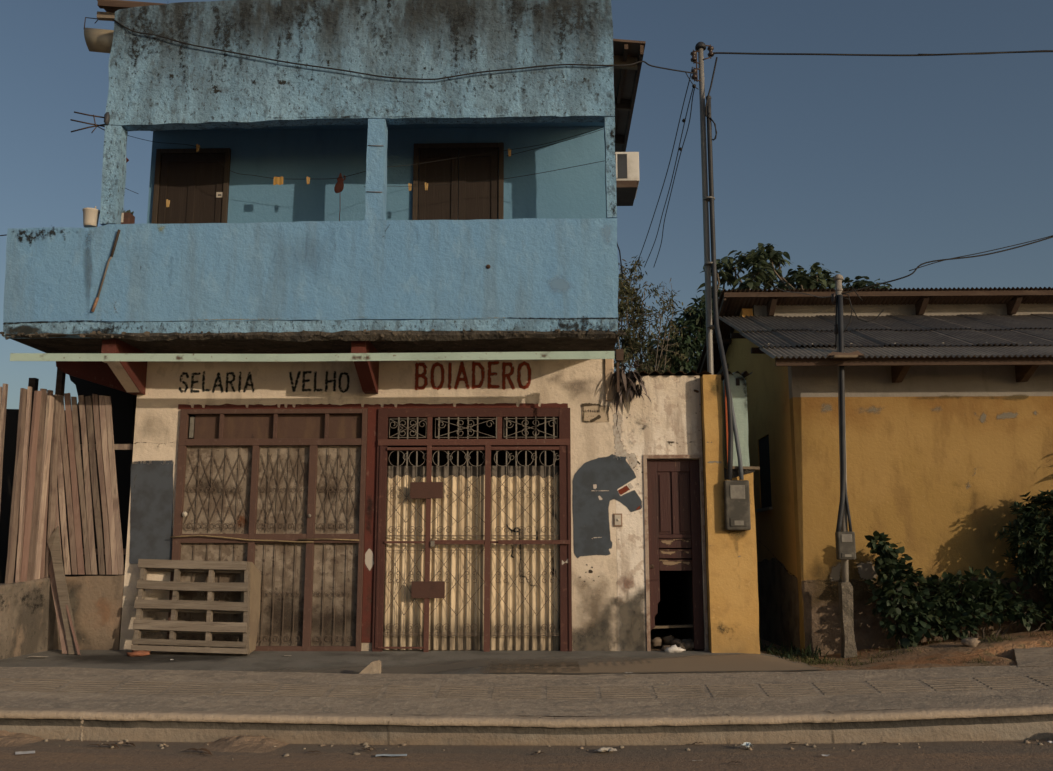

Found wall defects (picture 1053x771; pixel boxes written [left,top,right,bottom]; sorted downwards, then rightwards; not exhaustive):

water stain [121,6,197,90]
water stain [211,4,254,93]
water stain [276,0,333,86]
water stain [432,5,496,94]
water stain [508,0,598,59]
spalling [0,328,627,342]
water stain [572,581,647,651]